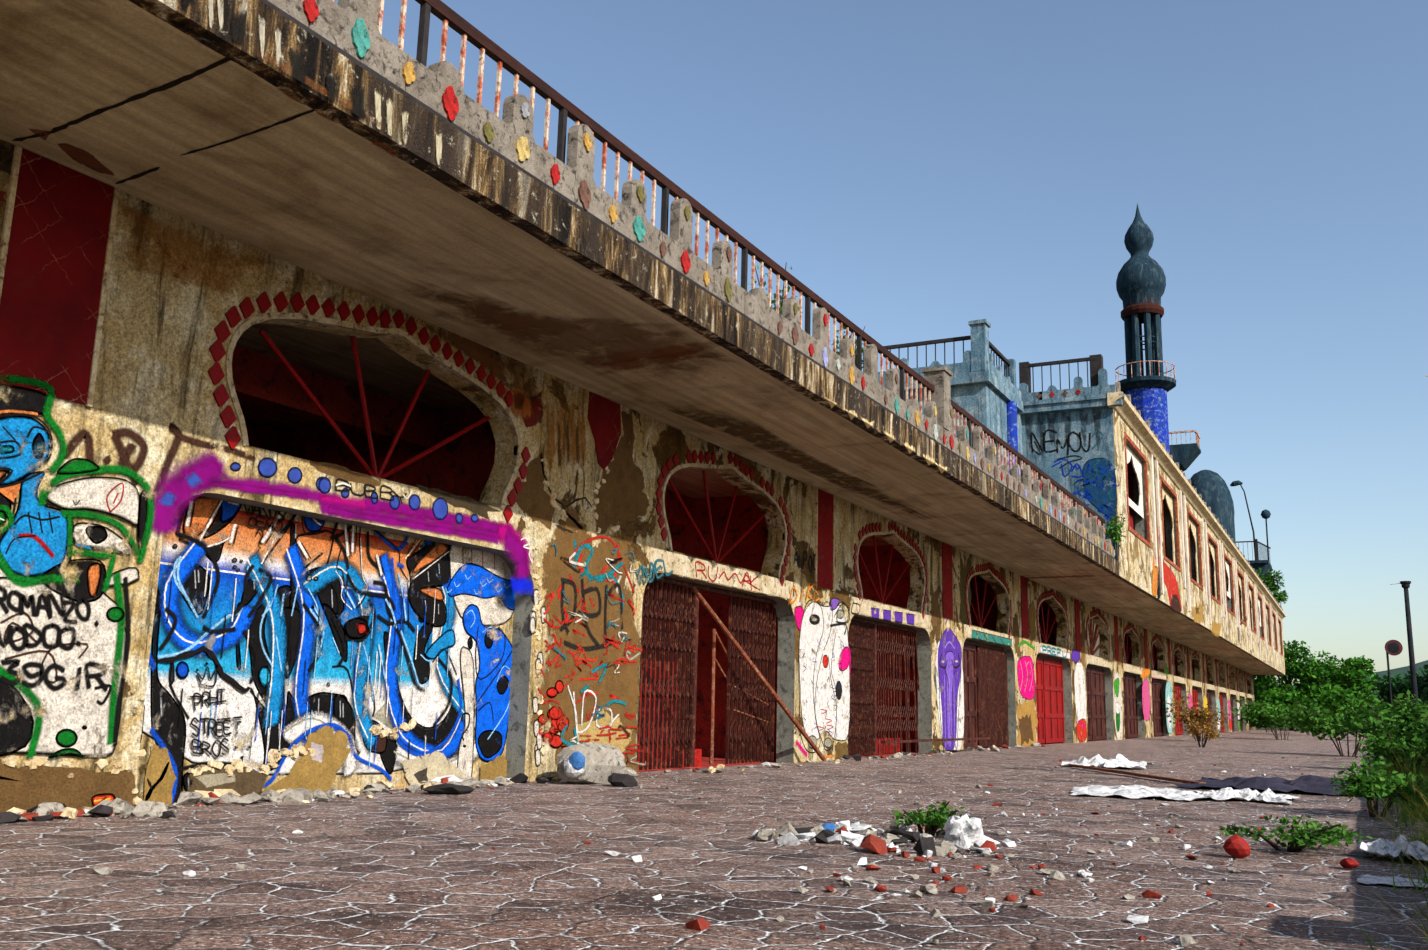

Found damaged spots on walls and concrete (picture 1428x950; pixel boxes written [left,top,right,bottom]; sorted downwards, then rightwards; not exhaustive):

crack [12,57,230,141]
crack [115,109,315,184]
leakage [416,285,695,418]
rust [593,345,710,372]
leakage [668,407,924,516]
leakage [825,397,947,474]
leakage [1025,410,1101,455]
spalling [512,411,650,774]
spalling [369,718,417,740]
crack [145,763,169,801]
spalling [0,726,352,813]
spalling [402,751,507,785]